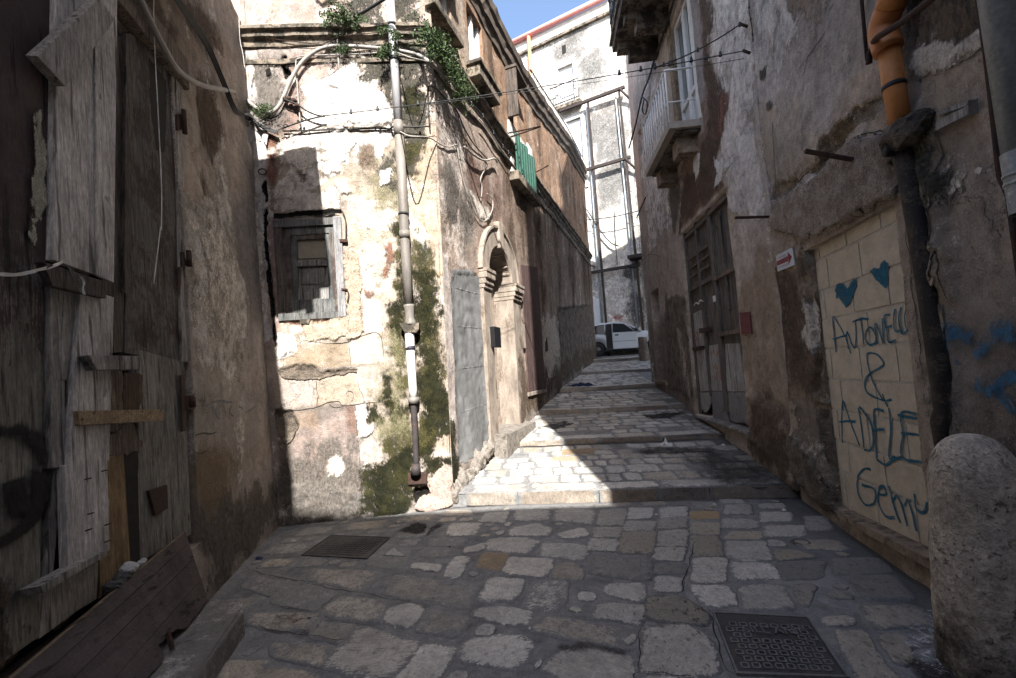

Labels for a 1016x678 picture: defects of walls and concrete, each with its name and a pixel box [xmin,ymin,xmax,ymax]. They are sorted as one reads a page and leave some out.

peeling [245,56,291,111]
peeling [267,61,394,201]
flaking render [773,97,885,200]
peeling [188,208,240,335]
peeling [254,194,266,284]
flaking render [271,208,342,219]
flaking render [277,335,357,380]
flaking render [274,409,298,445]